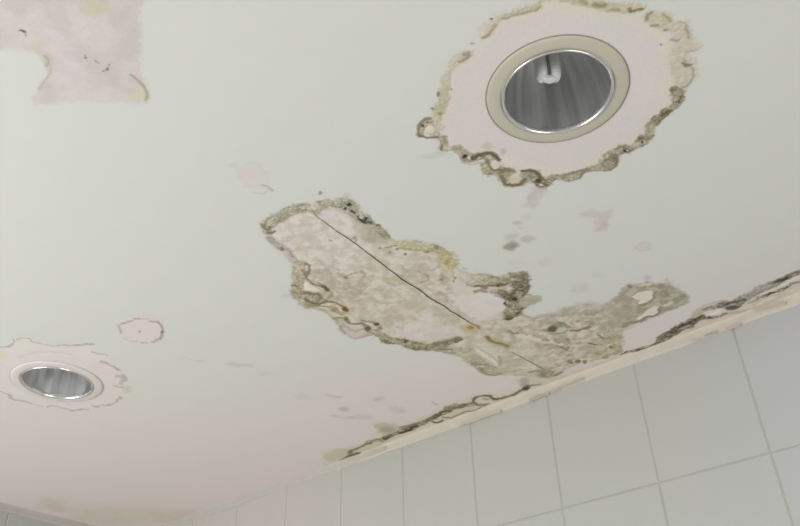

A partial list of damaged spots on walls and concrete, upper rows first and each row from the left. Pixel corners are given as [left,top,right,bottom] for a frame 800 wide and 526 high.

peeling [0,0,152,107]
crack [314,214,476,327]
peeling [255,193,630,378]